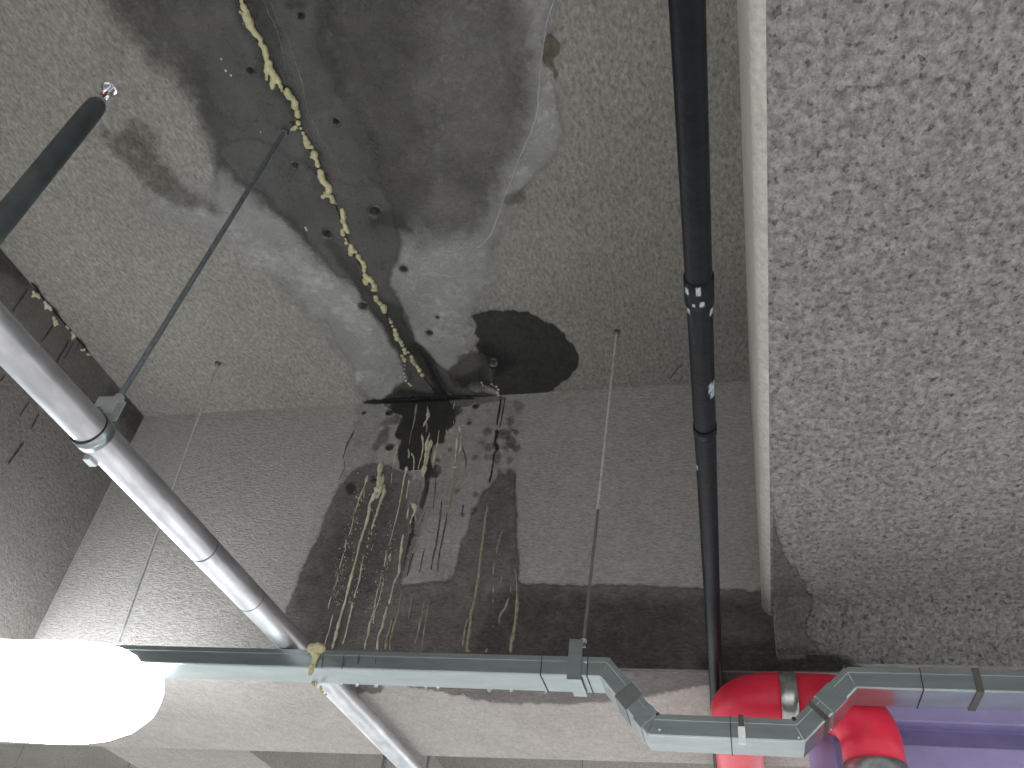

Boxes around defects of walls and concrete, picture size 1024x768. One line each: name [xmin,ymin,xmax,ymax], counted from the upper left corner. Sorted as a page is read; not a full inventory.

crack [255,0,485,404]
crack [31,282,89,353]
damp [104,0,709,697]
damp [720,515,856,685]
damp [408,686,611,705]